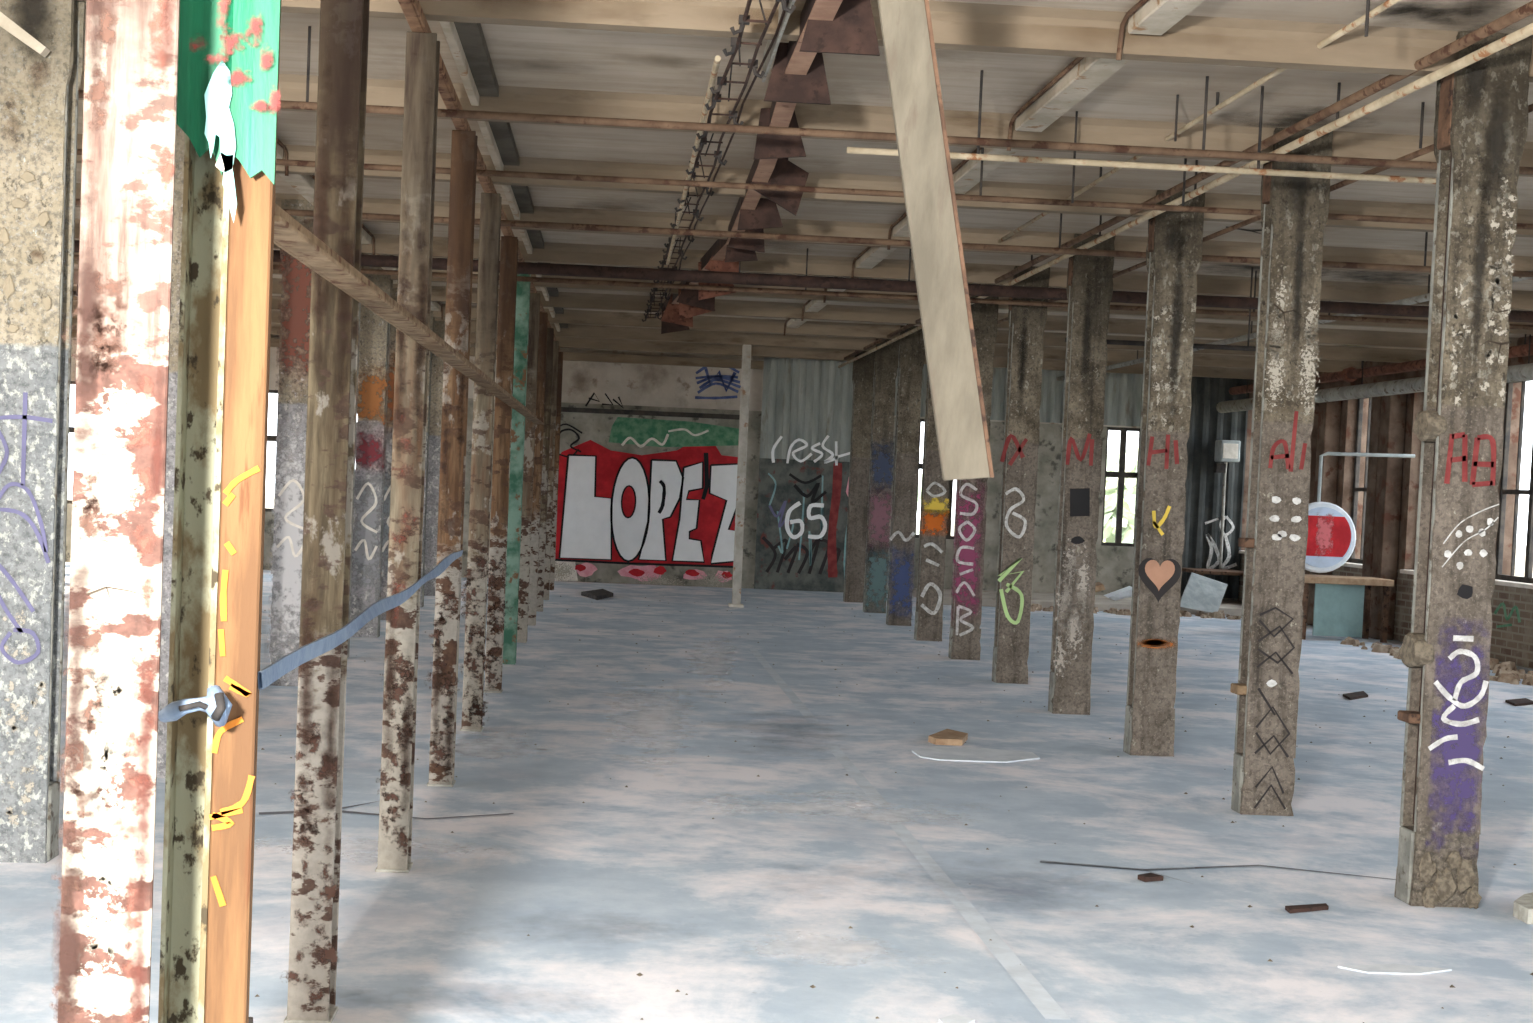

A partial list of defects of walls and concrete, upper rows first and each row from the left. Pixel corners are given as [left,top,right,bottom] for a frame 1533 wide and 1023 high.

water stain [15,0,47,41]
water stain [1386,3,1492,18]
peeling [215,152,233,172]
peeling [93,381,146,519]
peeling [74,655,144,1022]